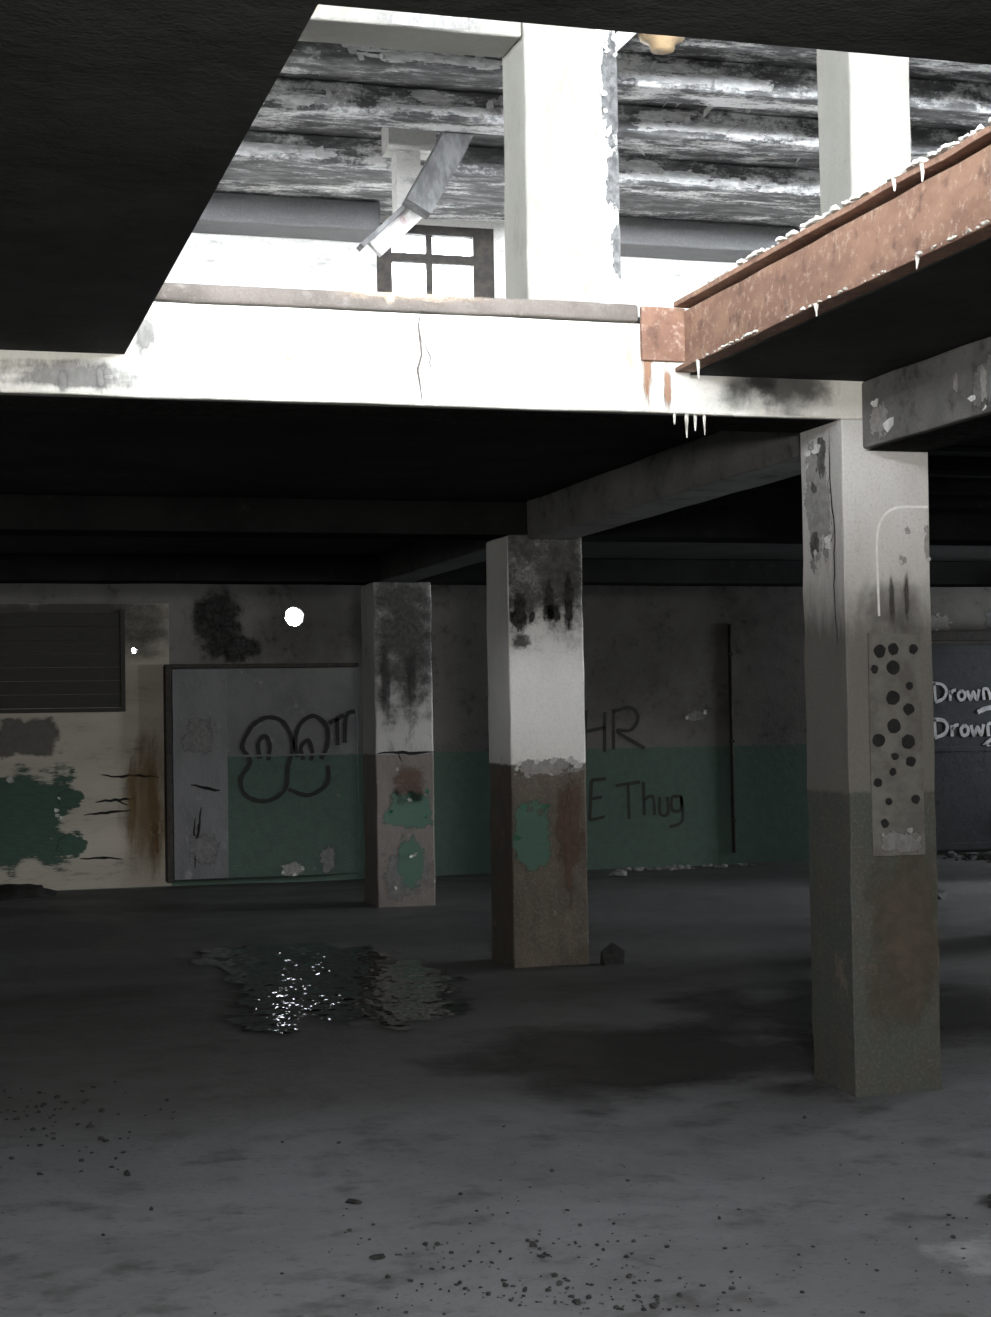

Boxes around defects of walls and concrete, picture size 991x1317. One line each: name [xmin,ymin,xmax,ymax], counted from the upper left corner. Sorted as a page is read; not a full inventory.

corrosion [627,335,671,407]
leakage [513,593,527,632]
leakage [543,575,574,630]
leakage [381,654,390,706]